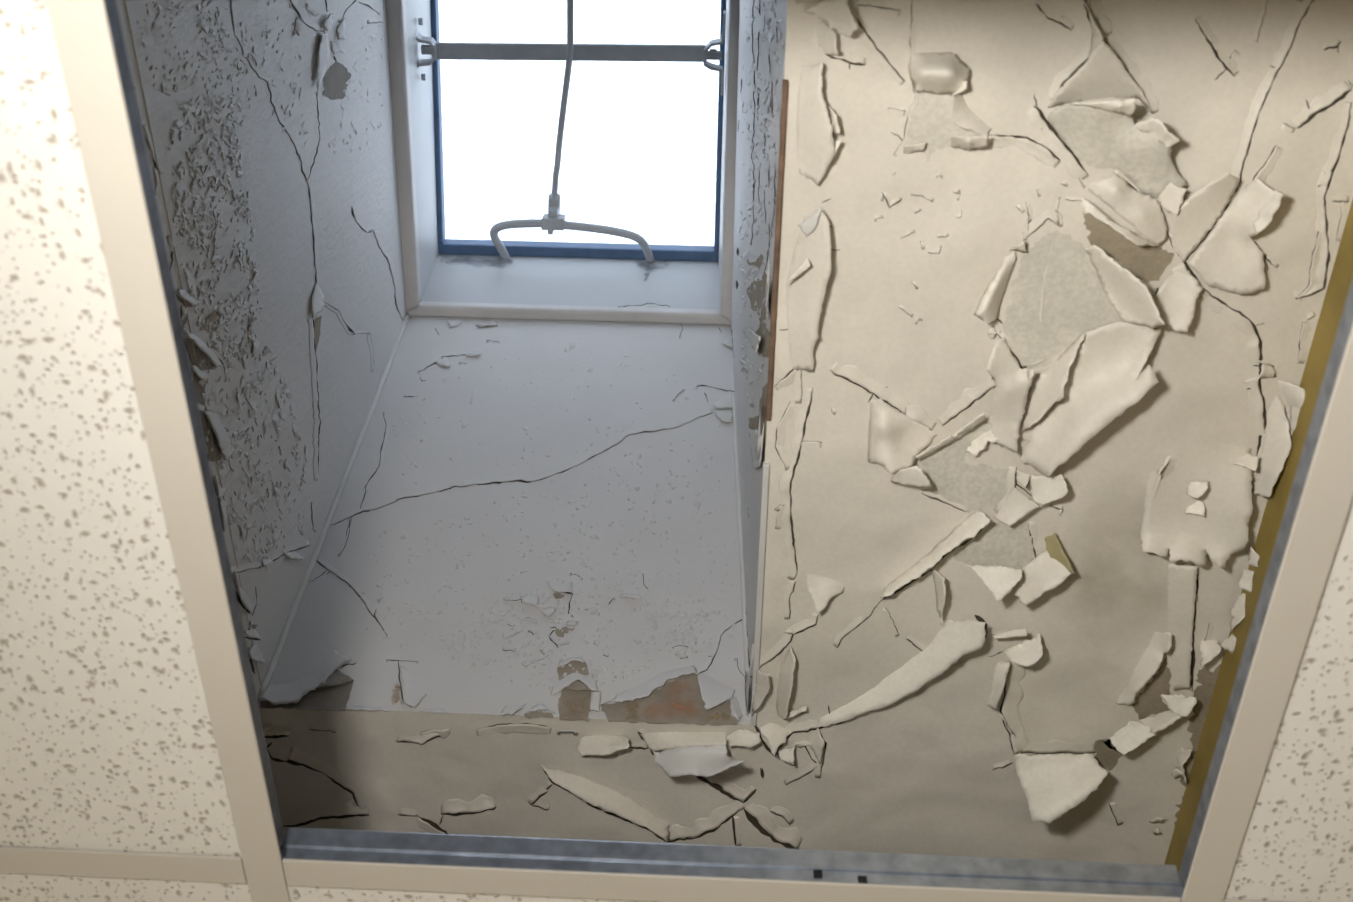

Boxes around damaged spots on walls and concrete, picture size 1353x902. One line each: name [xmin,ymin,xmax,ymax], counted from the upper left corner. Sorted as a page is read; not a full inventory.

peeling [294,2,351,100]
crack [230,0,384,372]
crack [351,206,404,320]
peeling [176,289,235,532]
peeling [307,283,324,481]
peeling [500,0,1305,842]
crack [231,409,713,637]
crack [267,723,552,834]
crack [668,705,845,849]